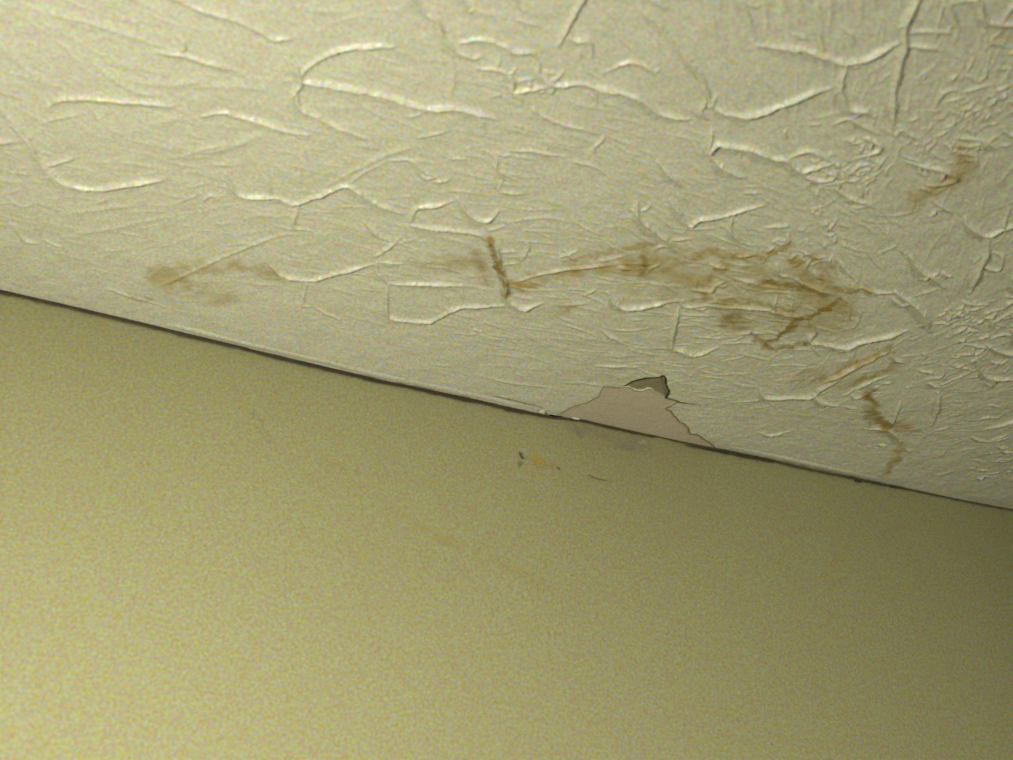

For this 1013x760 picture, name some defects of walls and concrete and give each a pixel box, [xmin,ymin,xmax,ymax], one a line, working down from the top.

water stain [487,237,535,298]
water stain [759,277,859,349]
peeling [538,375,714,447]